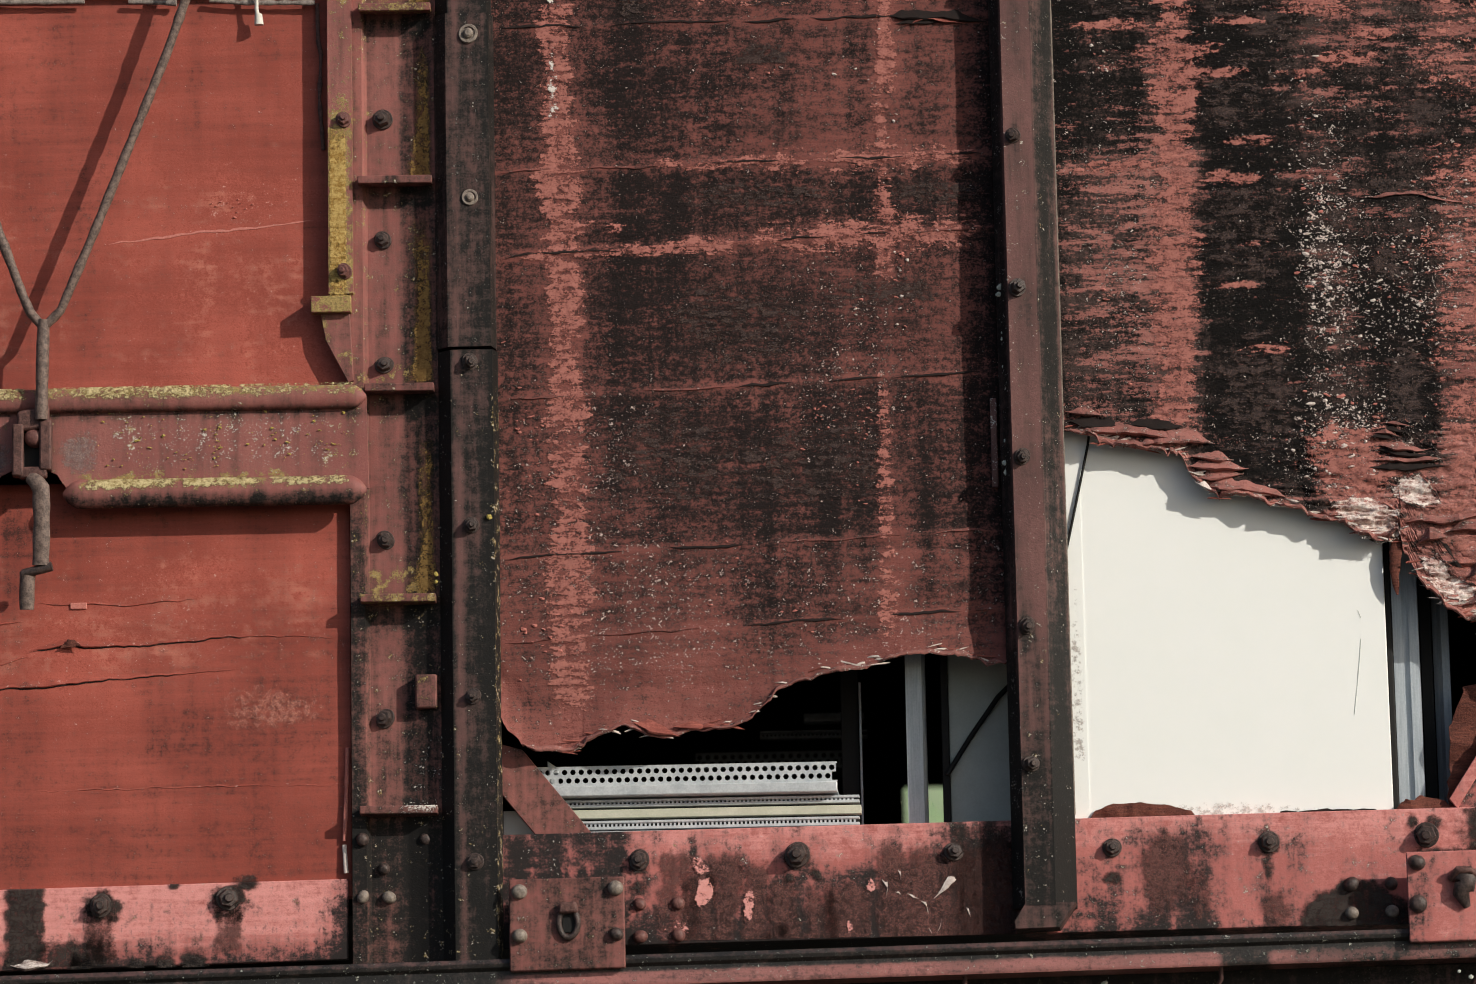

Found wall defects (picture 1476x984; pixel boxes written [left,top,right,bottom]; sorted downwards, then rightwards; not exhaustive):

peeling [1294,170,1475,382]
peeling [1064,406,1291,500]
peeling [1272,363,1476,607]
crack [0,599,326,691]
peeling [521,597,581,667]
peeling [633,719,721,737]
corrosion [628,850,649,894]
corrosion [1102,839,1122,884]
corrosion [1255,839,1280,876]
corrosion [1407,808,1476,852]
corrosion [82,889,124,963]
corrosion [212,885,252,954]